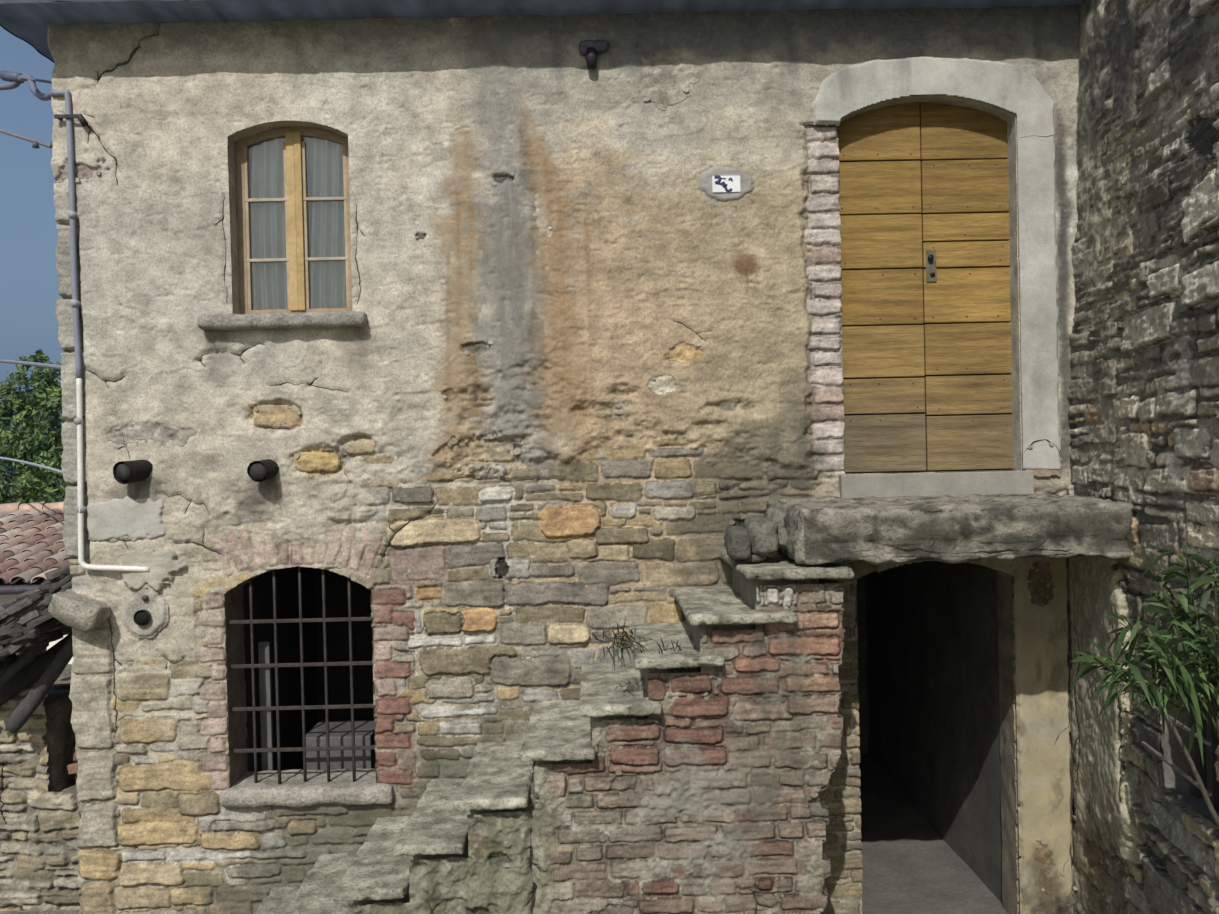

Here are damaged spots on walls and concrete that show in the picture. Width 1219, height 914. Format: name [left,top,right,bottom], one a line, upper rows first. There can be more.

crack [96,23,160,84]
crack [80,113,120,184]
crack [214,200,227,302]
crack [355,205,364,304]
water stain [466,55,549,465]
water stain [481,0,1143,451]
crack [199,343,260,366]
crack [277,378,343,391]
peeling [1025,561,1058,607]